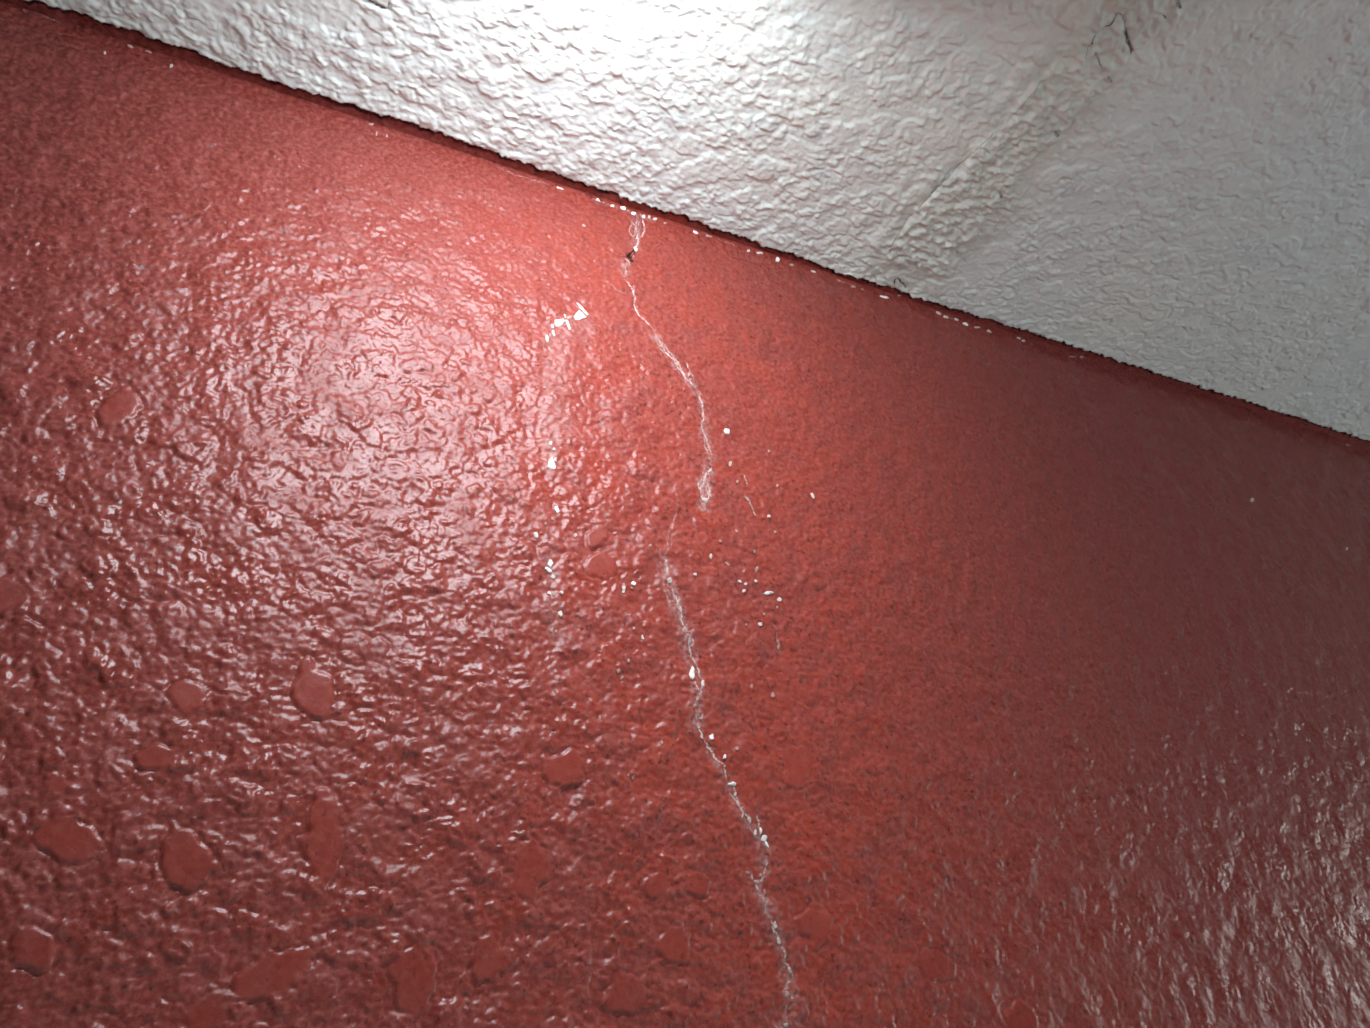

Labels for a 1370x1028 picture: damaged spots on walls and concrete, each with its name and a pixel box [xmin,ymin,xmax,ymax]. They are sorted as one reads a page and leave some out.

crack [619,220,712,502]
crack [665,560,793,1027]